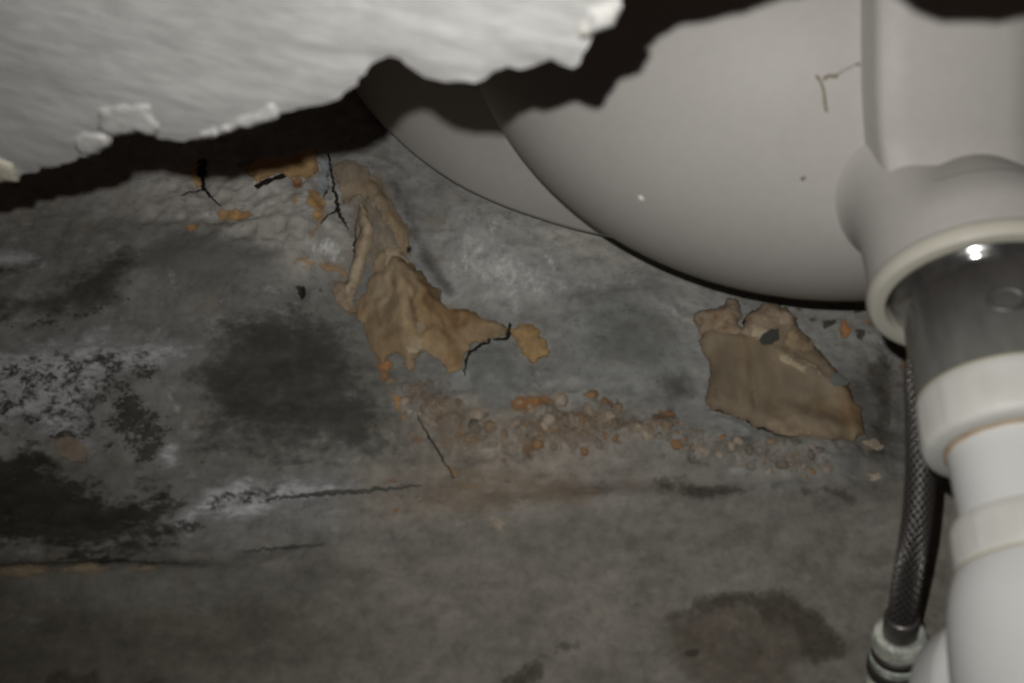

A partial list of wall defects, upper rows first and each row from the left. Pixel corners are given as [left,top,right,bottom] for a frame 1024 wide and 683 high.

crack [181,159,222,207]
flaking render [244,148,330,191]
crack [321,152,358,259]
leakage [201,313,374,444]
crack [463,322,512,377]
flaking render [331,203,883,479]
leakage [0,333,423,564]
crack [417,415,455,479]
leakage [675,594,844,683]